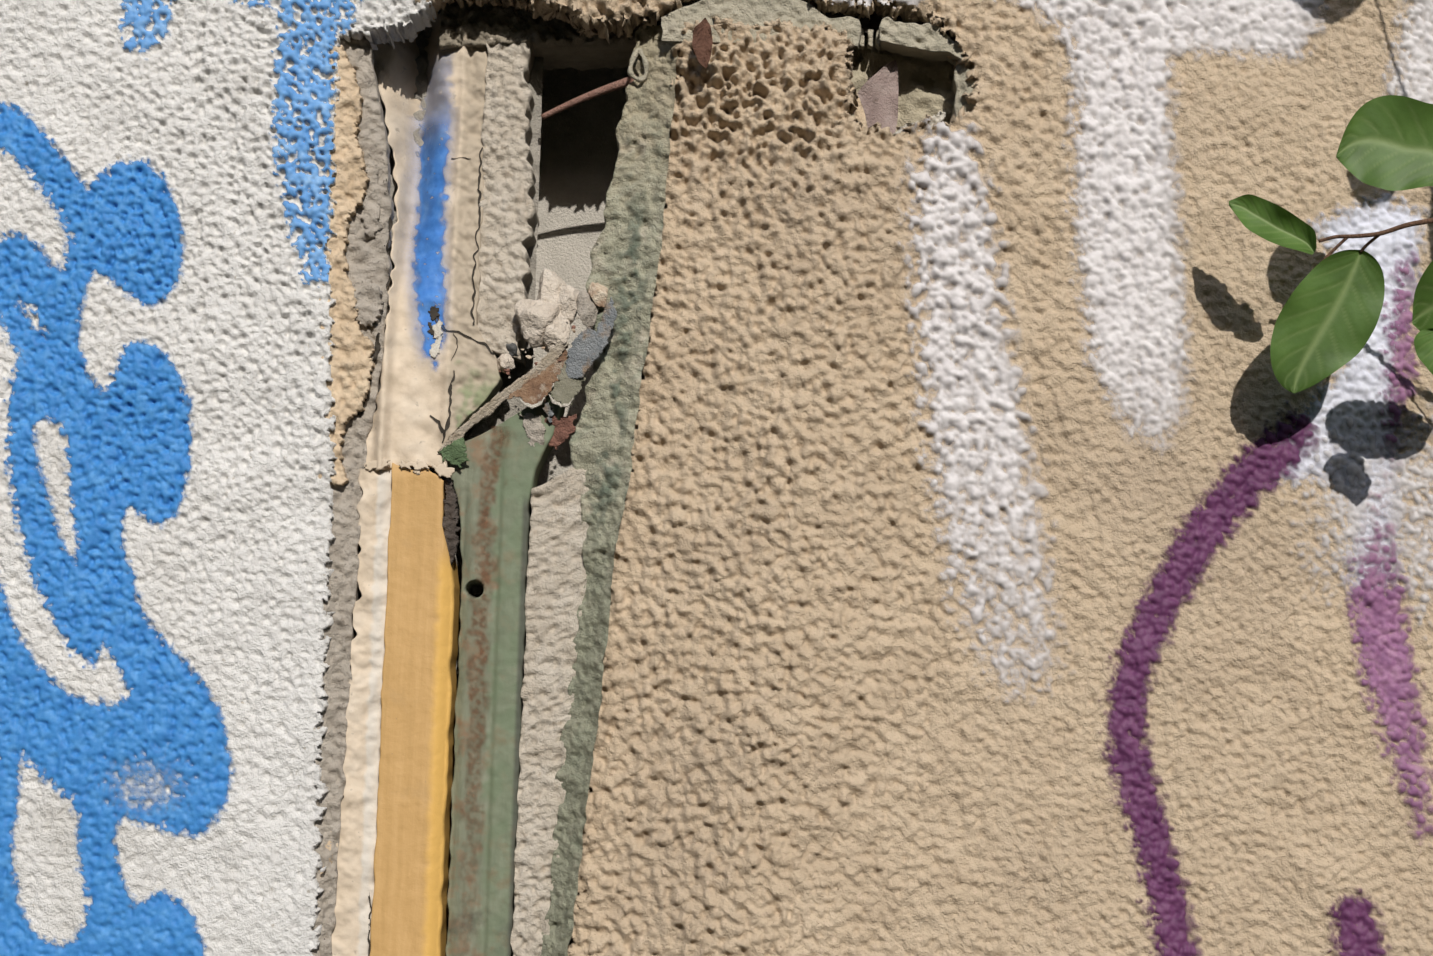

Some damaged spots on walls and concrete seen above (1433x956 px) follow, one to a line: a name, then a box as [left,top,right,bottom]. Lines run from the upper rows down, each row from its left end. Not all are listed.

flaking render [318,45,384,486]
spalling [439,0,636,300]
spalling [848,17,975,136]
peeling [364,297,618,565]